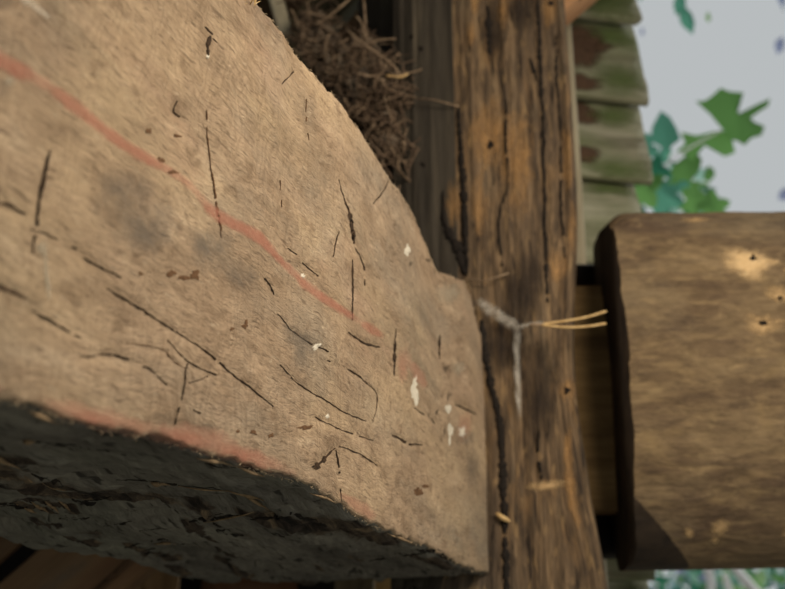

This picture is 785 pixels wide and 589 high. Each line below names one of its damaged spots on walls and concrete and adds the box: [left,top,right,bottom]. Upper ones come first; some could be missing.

crack [206,110,222,238]
crack [440,108,470,276]
crack [0,150,274,424]
crack [278,314,331,362]
crack [333,179,397,376]
crack [280,364,378,501]
crack [392,435,423,446]